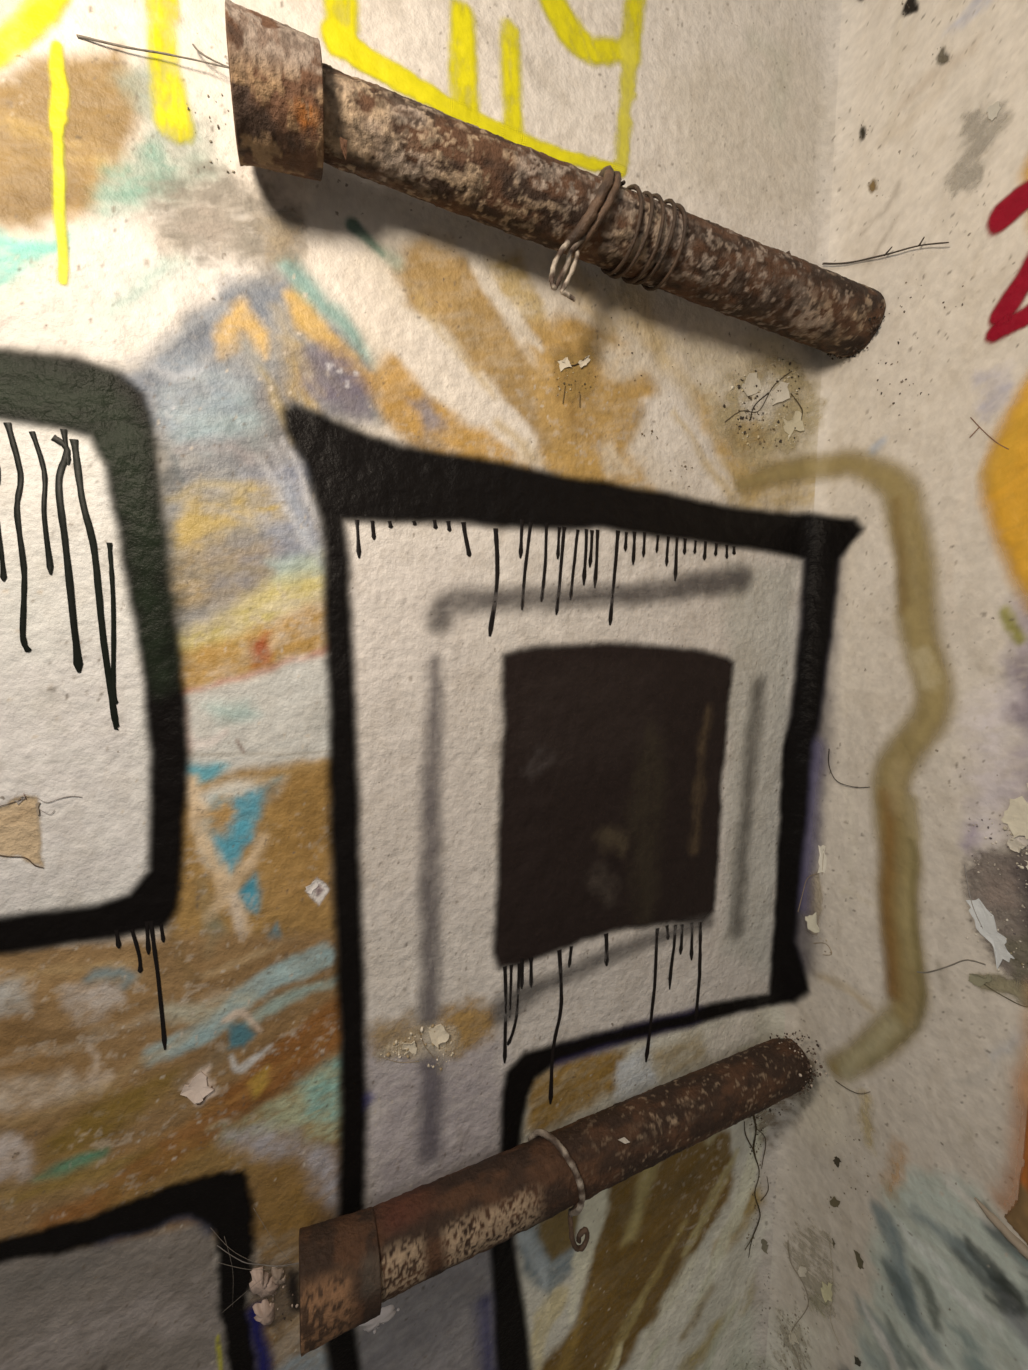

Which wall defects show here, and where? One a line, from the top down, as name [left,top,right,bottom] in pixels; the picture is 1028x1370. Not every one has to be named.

peeling [0,795,81,868]
peeling [917,783,1028,1007]
flaking render [217,1245,300,1326]